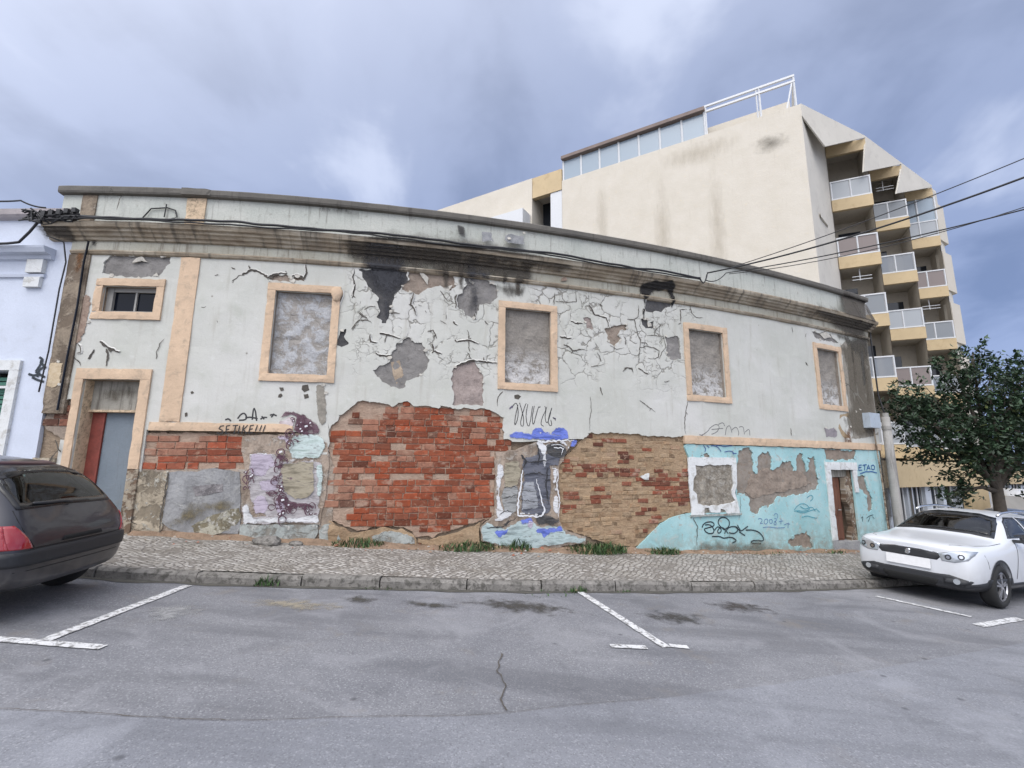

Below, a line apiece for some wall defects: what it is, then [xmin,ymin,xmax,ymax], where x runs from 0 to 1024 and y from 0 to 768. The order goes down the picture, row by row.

spalling [104,256,170,279]
crack [215,265,308,283]
spalling [373,338,429,389]
crack [340,269,497,366]
spalling [359,269,499,323]
leakage [348,225,570,295]
crack [553,291,703,428]
leakage [817,293,876,436]
spalling [142,431,245,470]
spalling [316,361,511,538]
spalling [558,432,691,547]
spalling [737,330,878,514]